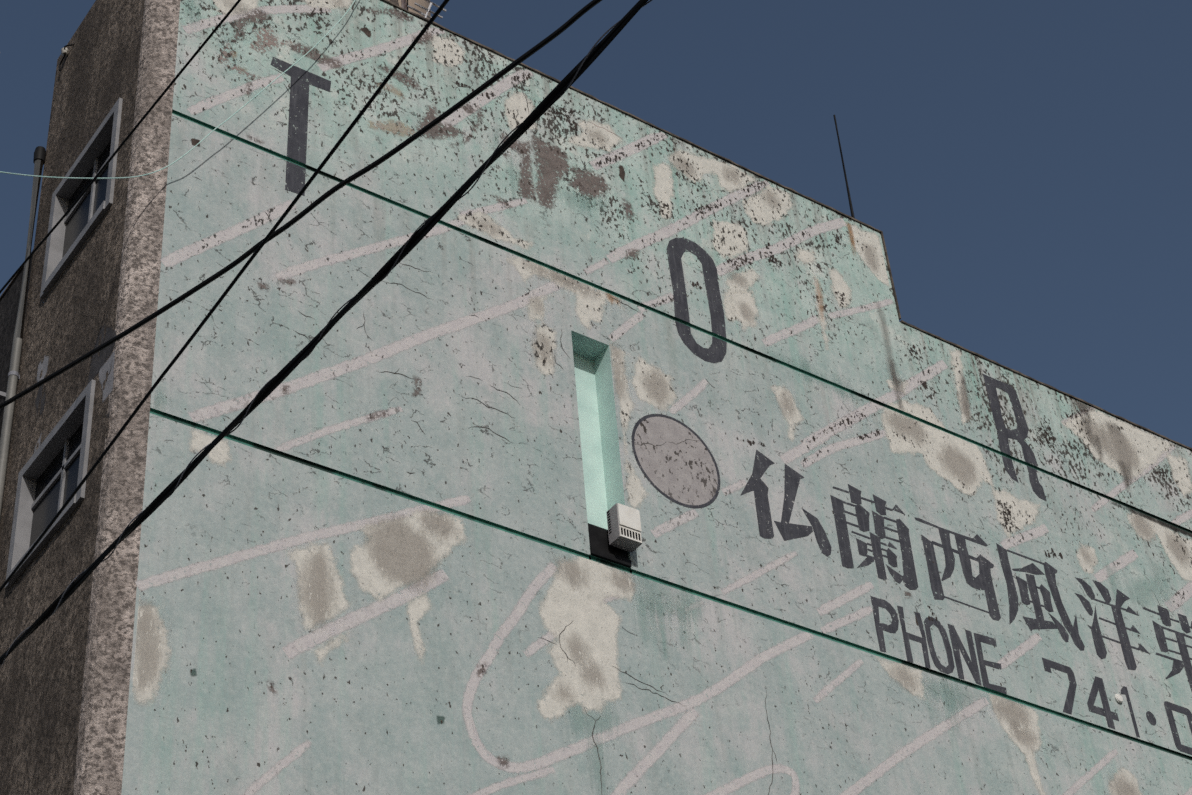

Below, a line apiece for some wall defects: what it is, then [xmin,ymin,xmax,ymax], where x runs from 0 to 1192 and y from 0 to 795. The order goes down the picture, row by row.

peeling [219,10,343,95]
peeling [382,67,419,97]
peeling [502,133,608,208]
crack [584,708,602,789]